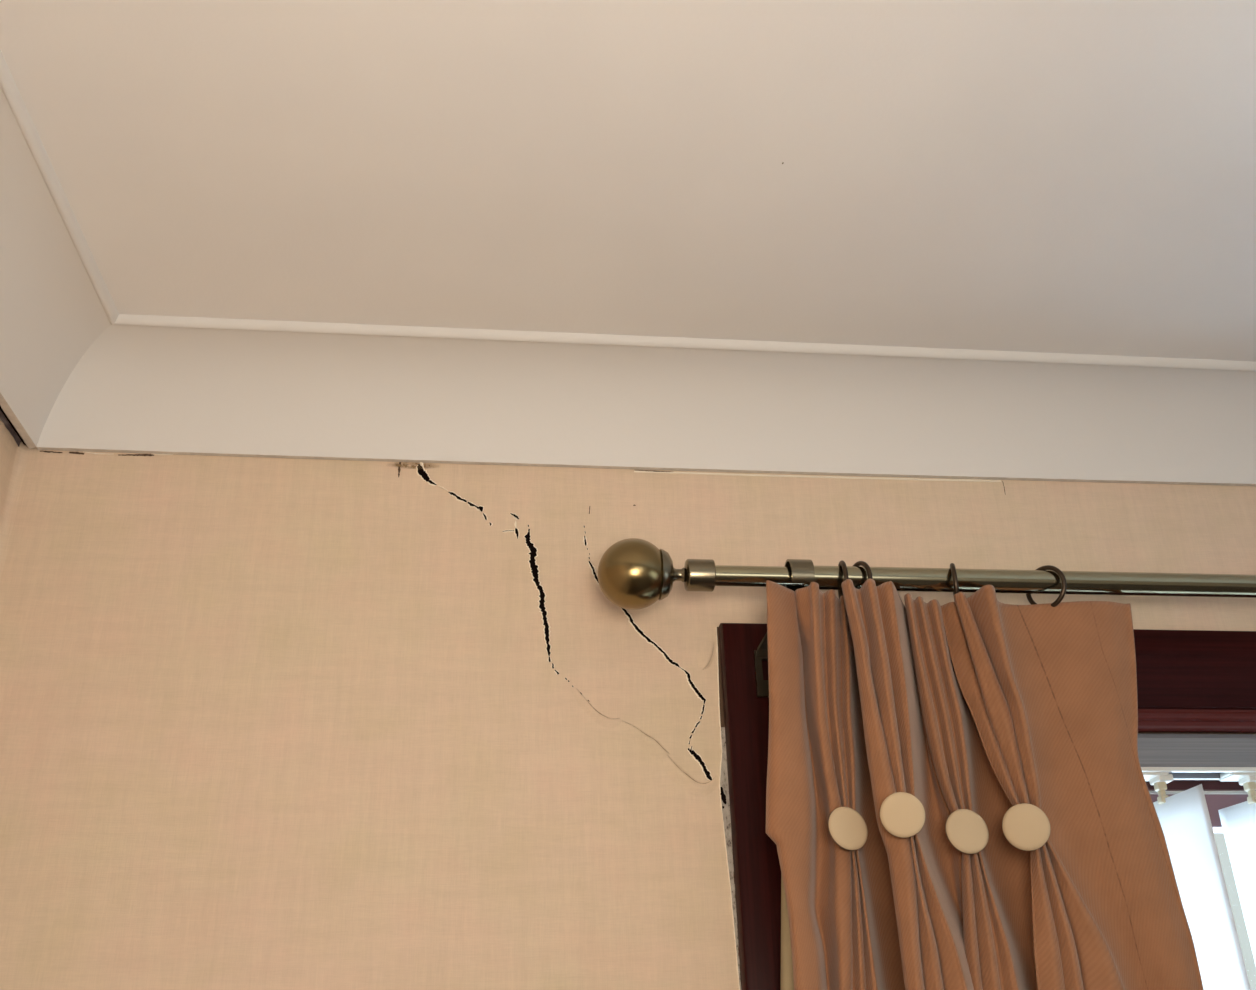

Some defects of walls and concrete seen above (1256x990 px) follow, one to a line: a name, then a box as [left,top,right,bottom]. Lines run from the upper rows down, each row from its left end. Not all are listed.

crack [416,462,589,701]
crack [583,507,600,587]
crack [621,608,713,781]